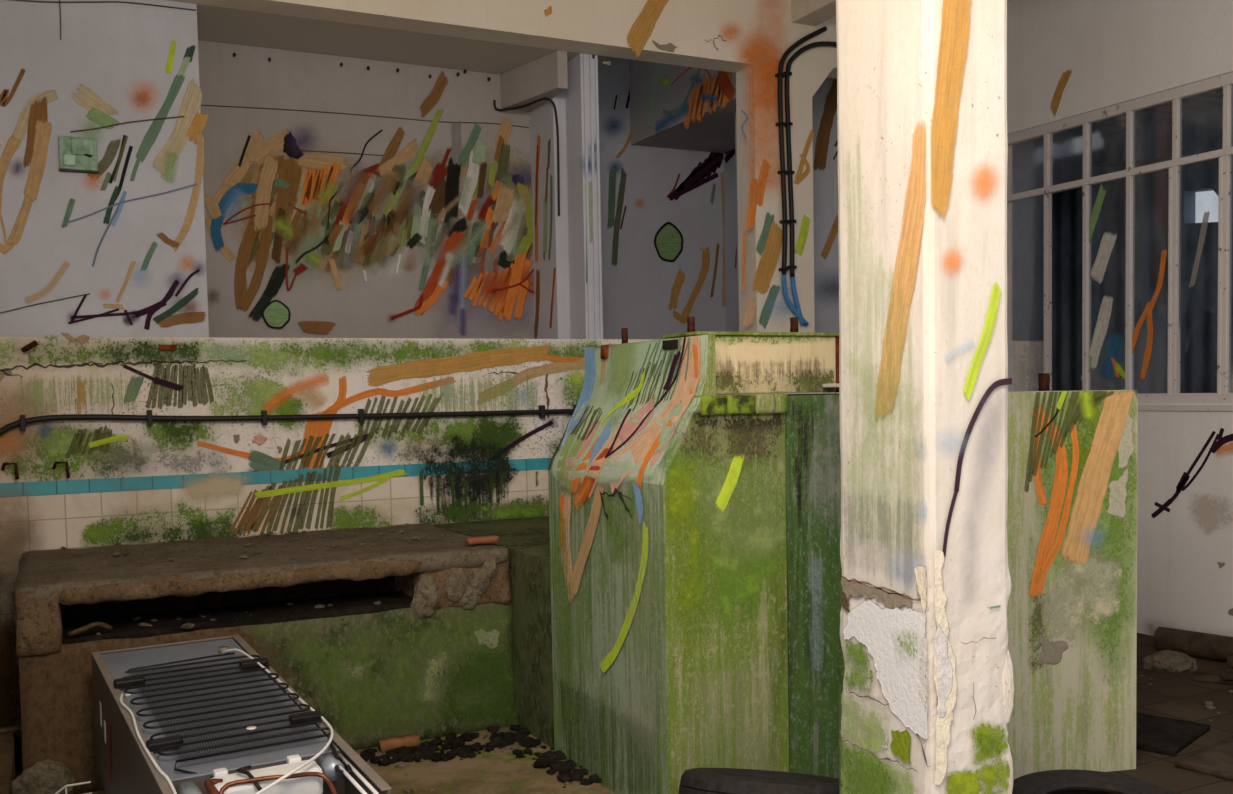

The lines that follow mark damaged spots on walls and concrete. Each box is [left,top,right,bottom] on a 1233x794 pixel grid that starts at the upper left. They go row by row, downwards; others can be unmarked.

crack [0,359,247,414]
damp [92,445,231,478]
damp [682,411,785,468]
spalling [395,555,511,619]
peeling [840,550,958,786]